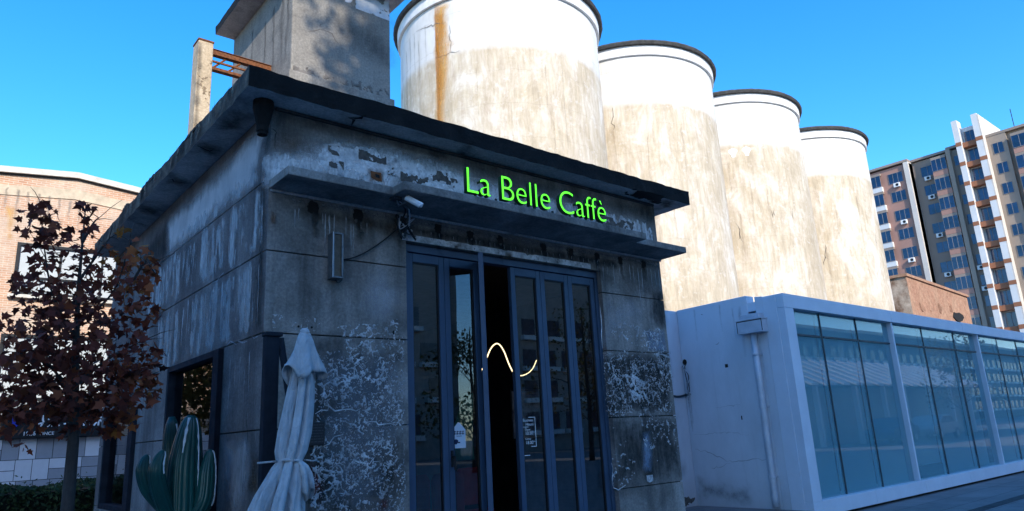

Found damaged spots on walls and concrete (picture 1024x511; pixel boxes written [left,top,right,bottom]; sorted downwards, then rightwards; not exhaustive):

peeling [345,0,390,21]
corrosion [435,6,447,111]
peeling [281,142,462,193]
leakage [142,150,266,367]
leakage [303,350,395,511]
leakage [607,342,678,481]